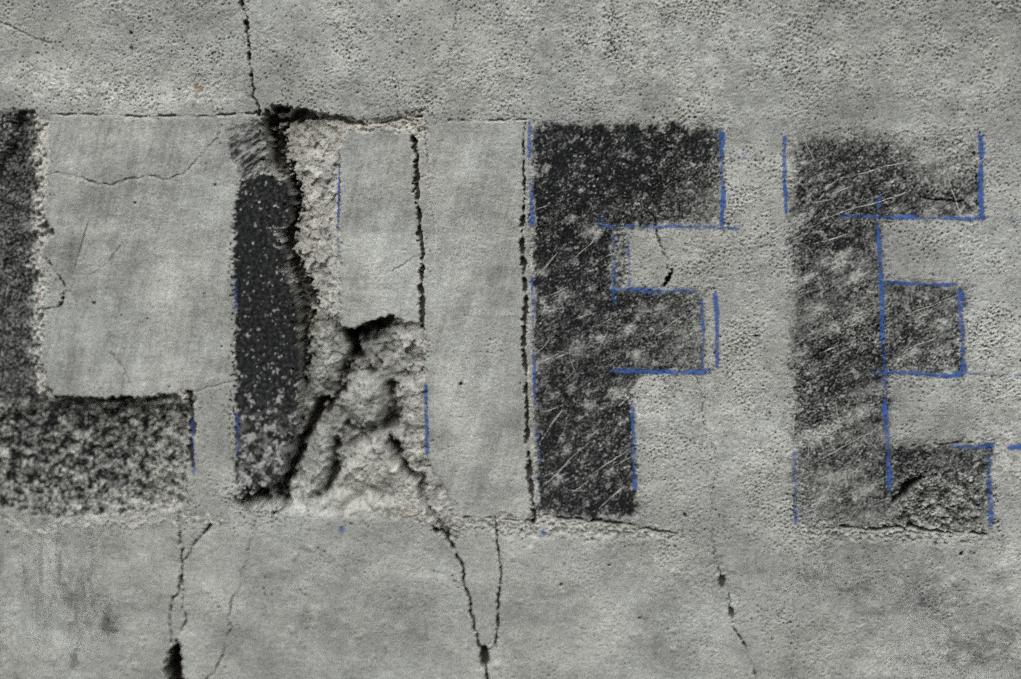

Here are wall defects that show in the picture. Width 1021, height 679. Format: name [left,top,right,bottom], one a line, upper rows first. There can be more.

peeling [68,79,144,112]
peeling [182,69,253,117]
crack [238,0,262,119]
spalling [0,105,740,618]
crack [650,208,758,679]
crack [163,516,257,679]
crack [431,516,503,679]